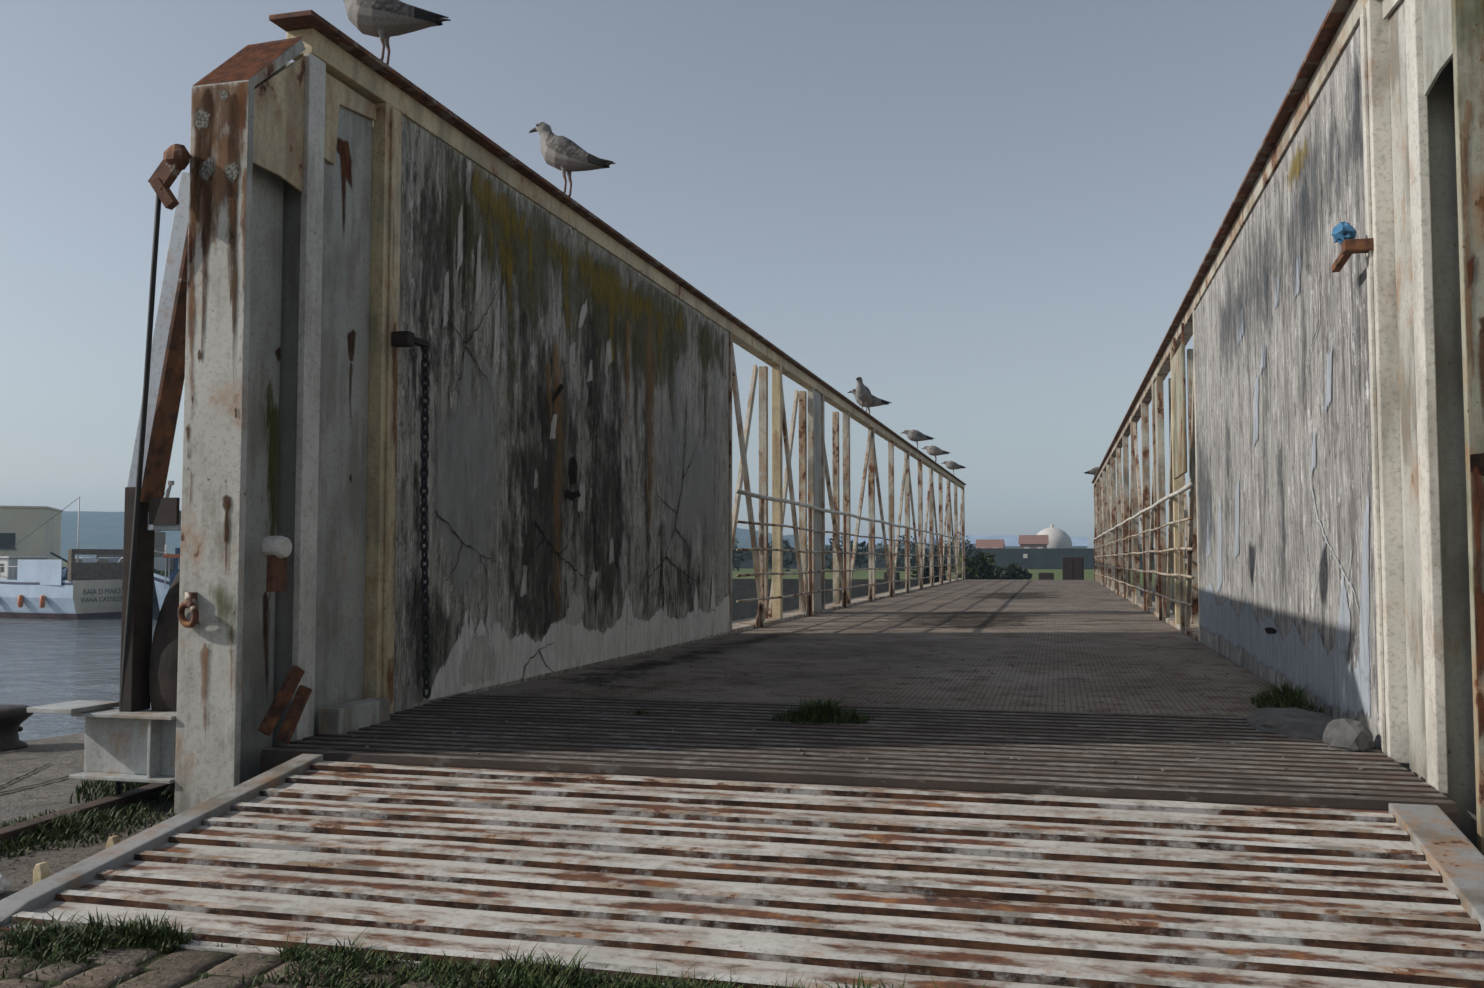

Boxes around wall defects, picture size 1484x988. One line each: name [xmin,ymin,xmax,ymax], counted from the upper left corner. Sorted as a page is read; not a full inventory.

corrosion [187,36,304,403]
leakage [1219,58,1364,424]
corrosion [1460,101,1484,407]
leakage [405,143,725,703]
crack [436,510,586,597]
crack [521,642,554,679]
leakage [574,632,796,685]
leakage [1197,424,1229,572]
leakage [1264,441,1284,583]
corrosion [1471,467,1484,738]
crack [0,763,84,793]